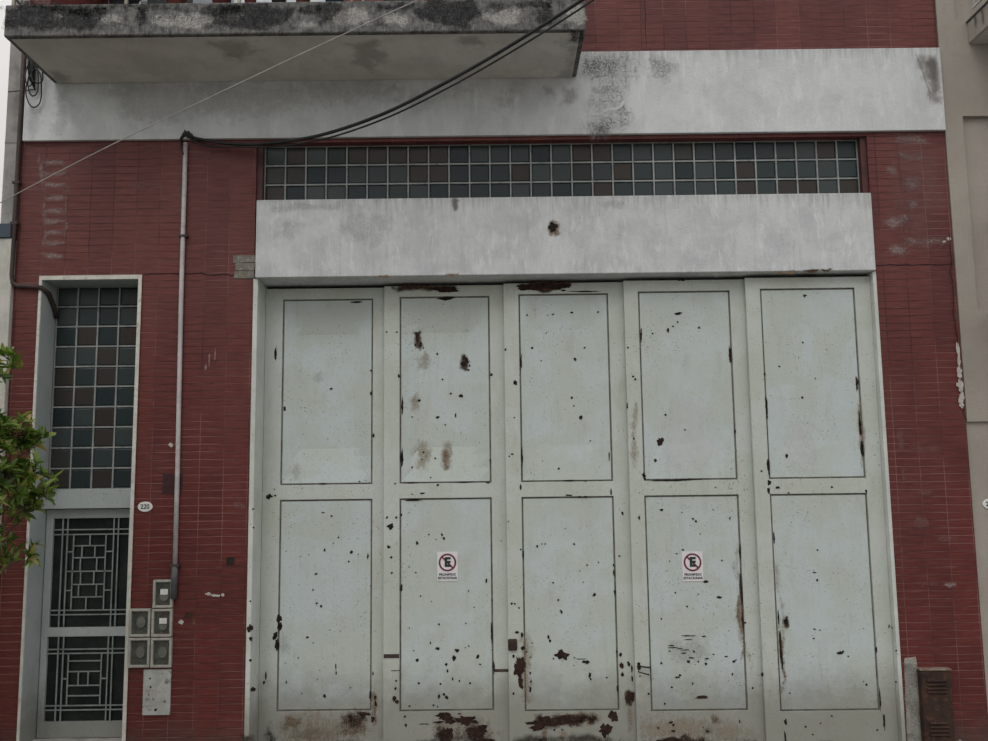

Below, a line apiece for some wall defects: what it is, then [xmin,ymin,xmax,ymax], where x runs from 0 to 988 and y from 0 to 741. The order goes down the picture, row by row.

water stain [2,1,118,30]
water stain [135,1,343,30]
water stain [920,58,939,101]
rust [378,274,459,293]
rust [516,281,571,293]
flaking render [956,342,965,409]
rust [513,641,530,698]
rust [279,693,377,741]
rust [434,712,495,741]
rust [525,690,635,741]